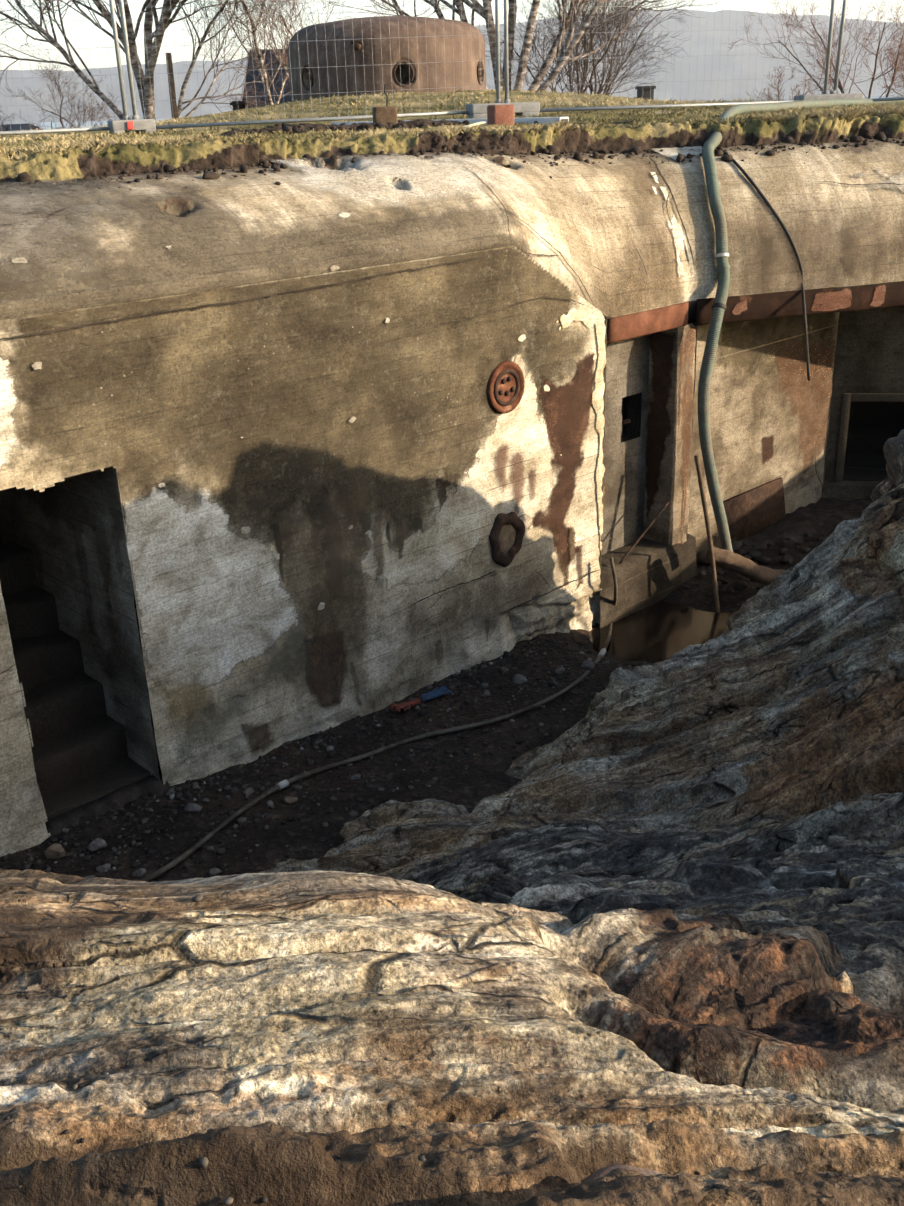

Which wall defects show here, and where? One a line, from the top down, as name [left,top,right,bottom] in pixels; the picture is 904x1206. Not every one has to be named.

damp [0,180,586,708]
rust [497,353,595,584]
damp [157,680,241,755]